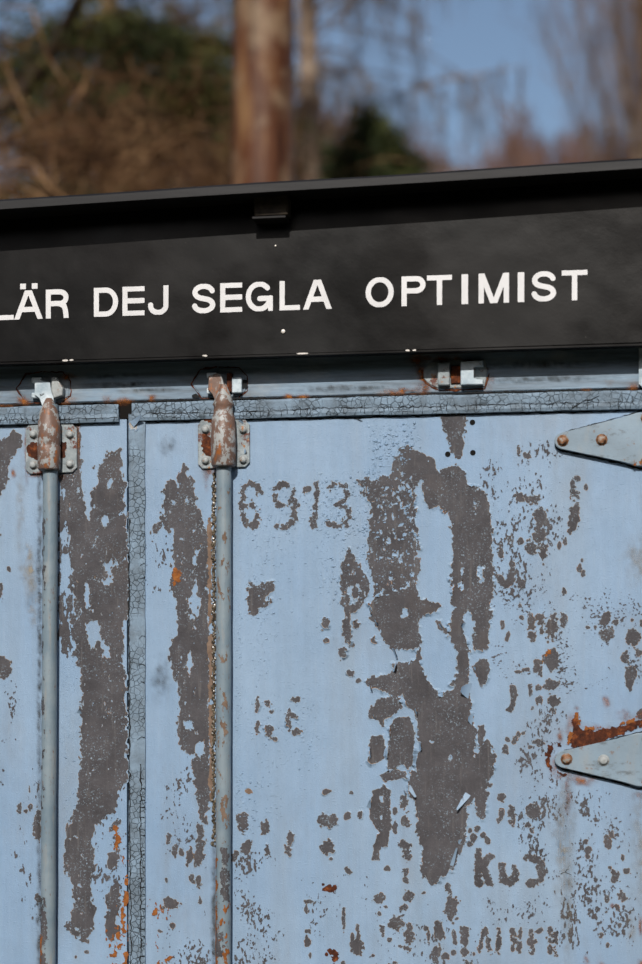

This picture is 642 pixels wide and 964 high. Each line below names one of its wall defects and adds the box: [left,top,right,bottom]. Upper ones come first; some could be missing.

peeling [0,428,24,498]
rust [25,438,38,460]
rust [201,419,212,457]
spalling [11,747,49,964]
peeling [57,423,129,959]
peeling [146,462,296,964]
peeling [296,413,642,964]
rust [545,712,642,787]